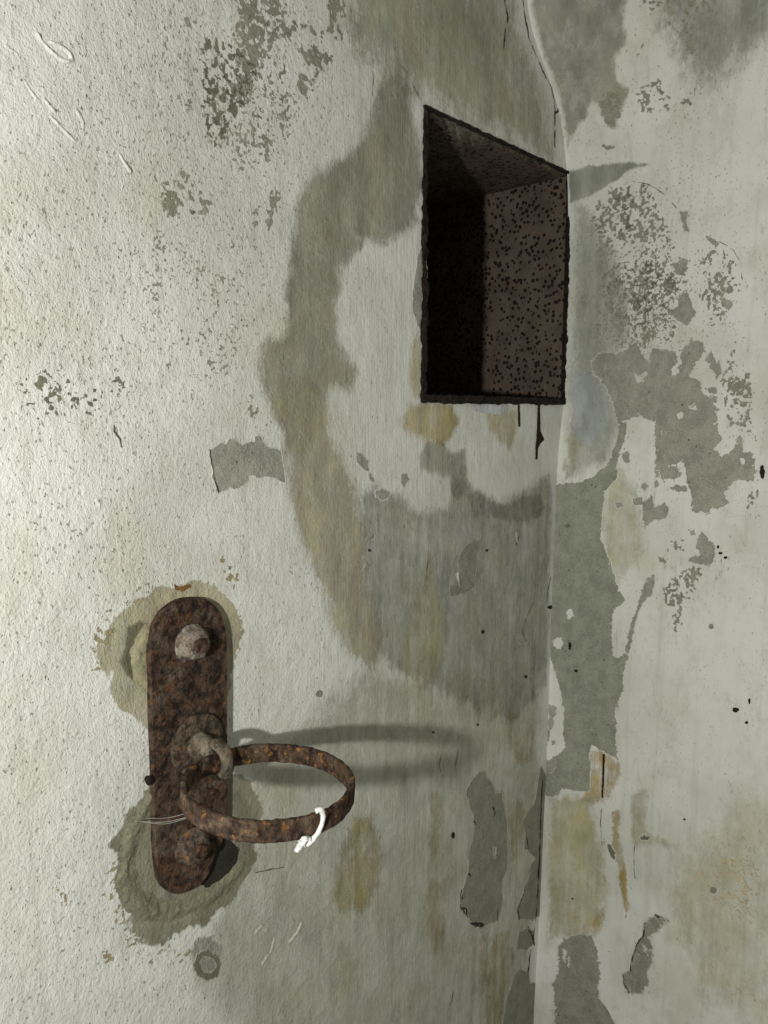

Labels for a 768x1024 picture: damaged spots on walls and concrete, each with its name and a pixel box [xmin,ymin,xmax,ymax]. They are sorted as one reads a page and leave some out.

peeling [184,0,346,171]
crack [503,0,559,147]
damp [533,0,628,135]
damp [262,0,552,439]
peeling [210,396,287,494]
peeling [517,182,765,951]
damp [122,622,144,678]
rust [109,802,139,871]
rust [135,812,217,901]
rust [127,838,257,946]
rust [228,774,263,820]
spalling [551,934,615,1024]